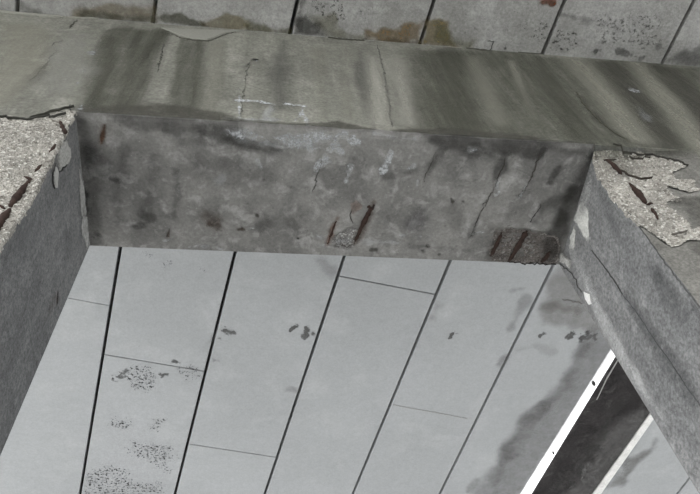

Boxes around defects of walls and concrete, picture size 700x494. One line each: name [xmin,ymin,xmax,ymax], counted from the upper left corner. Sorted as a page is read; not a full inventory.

damp [79,41,275,139]
damp [256,57,386,154]
crack [377,45,393,127]
damp [366,14,700,260]
spalling [0,105,77,254]
spalling [327,204,375,249]
crack [471,159,505,234]
spalling [488,143,700,305]
mould [112,364,168,390]
mould [565,331,597,342]
mould [82,466,164,494]
damp [571,415,642,494]